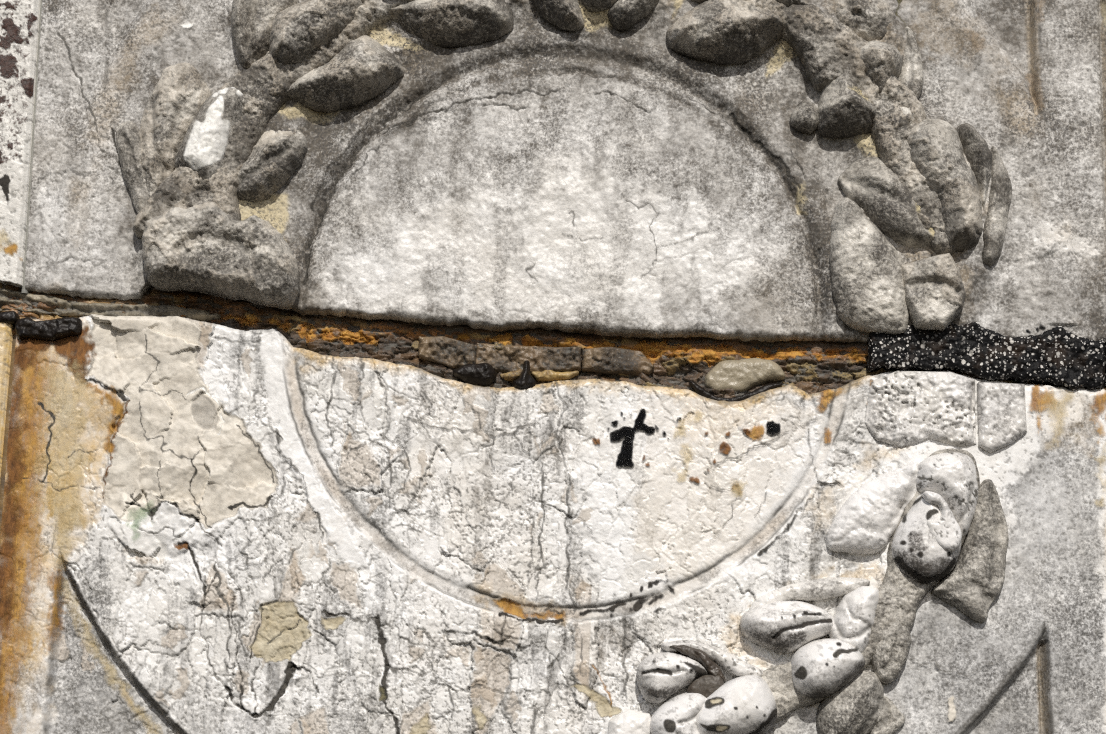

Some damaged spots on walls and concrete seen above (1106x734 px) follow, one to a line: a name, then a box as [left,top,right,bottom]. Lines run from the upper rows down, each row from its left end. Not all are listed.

crack [23,402,100,491]
corrosion [0,327,123,734]
spalling [84,314,278,528]
crack [125,426,327,669]
crack [325,358,591,734]
corrosion [486,333,866,367]
crack [711,419,844,555]
corrosion [818,389,840,411]
spalling [175,542,319,718]
spalling [321,611,351,630]
crack [621,617,629,701]